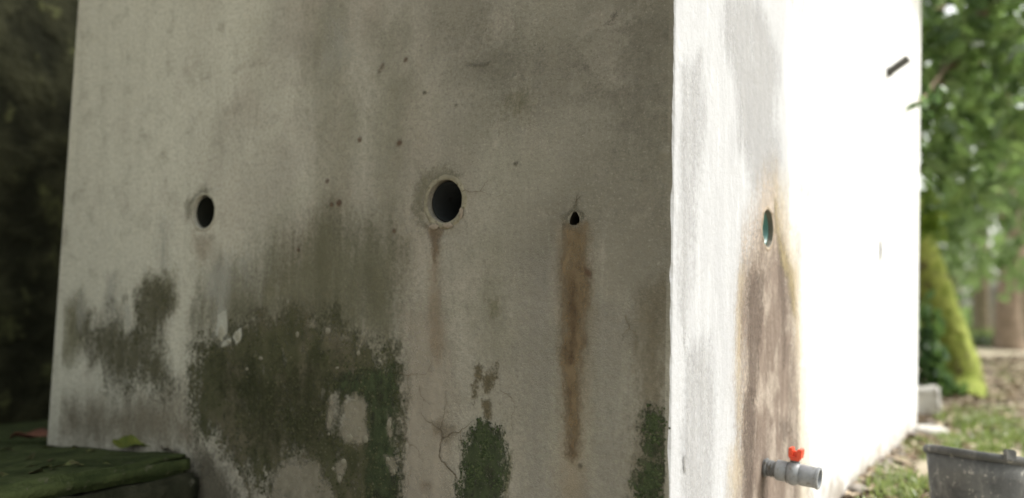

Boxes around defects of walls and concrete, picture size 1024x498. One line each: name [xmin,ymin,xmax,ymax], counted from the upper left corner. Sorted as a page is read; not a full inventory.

water stain [727,3,811,498]
mould [471,362,499,406]
rust [559,223,591,458]
water stain [189,449,239,498]
crack [419,387,474,478]